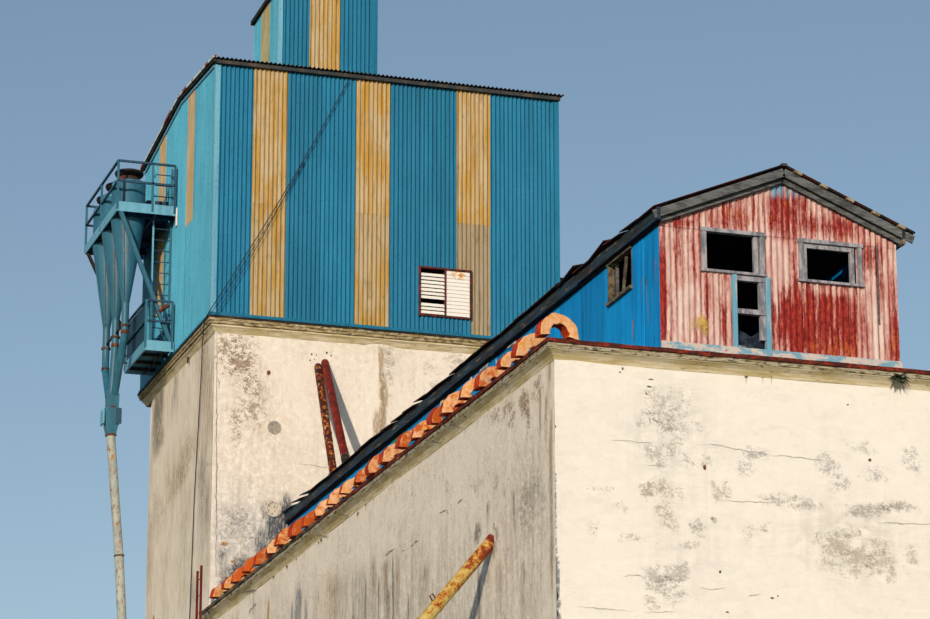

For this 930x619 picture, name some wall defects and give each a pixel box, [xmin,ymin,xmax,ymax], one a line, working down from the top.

peeling [215,334,271,443]
crack [706,444,827,461]
leakage [258,496,291,551]
leakage [291,591,307,619]
leakage [373,562,394,619]